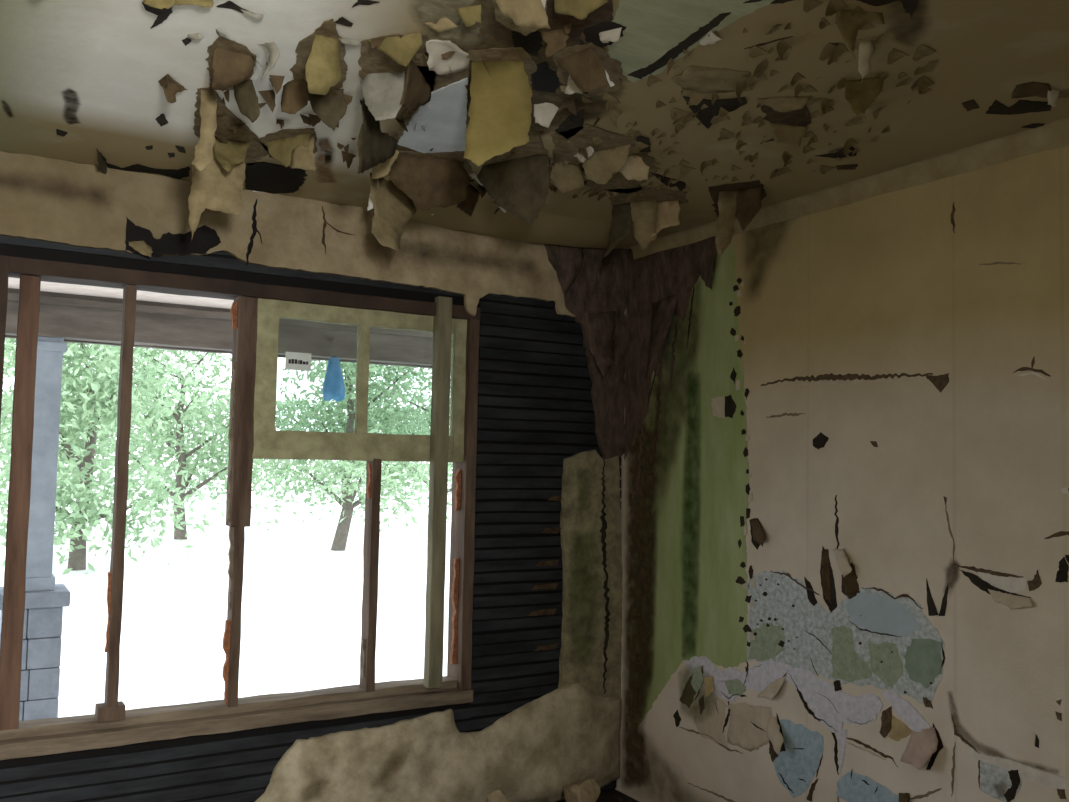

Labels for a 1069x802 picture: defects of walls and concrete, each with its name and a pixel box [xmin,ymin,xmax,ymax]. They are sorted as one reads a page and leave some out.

peeling [0,0,938,297]
crack [246,199,262,266]
crack [322,206,353,254]
crack [761,373,949,393]
spalling [452,294,602,733]
leakage [600,460,611,694]
leakage [623,304,699,802]
peeling [804,546,860,612]
crack [833,495,841,549]
peeling [926,564,957,616]
crack [1044,531,1069,539]
spalling [0,711,438,802]